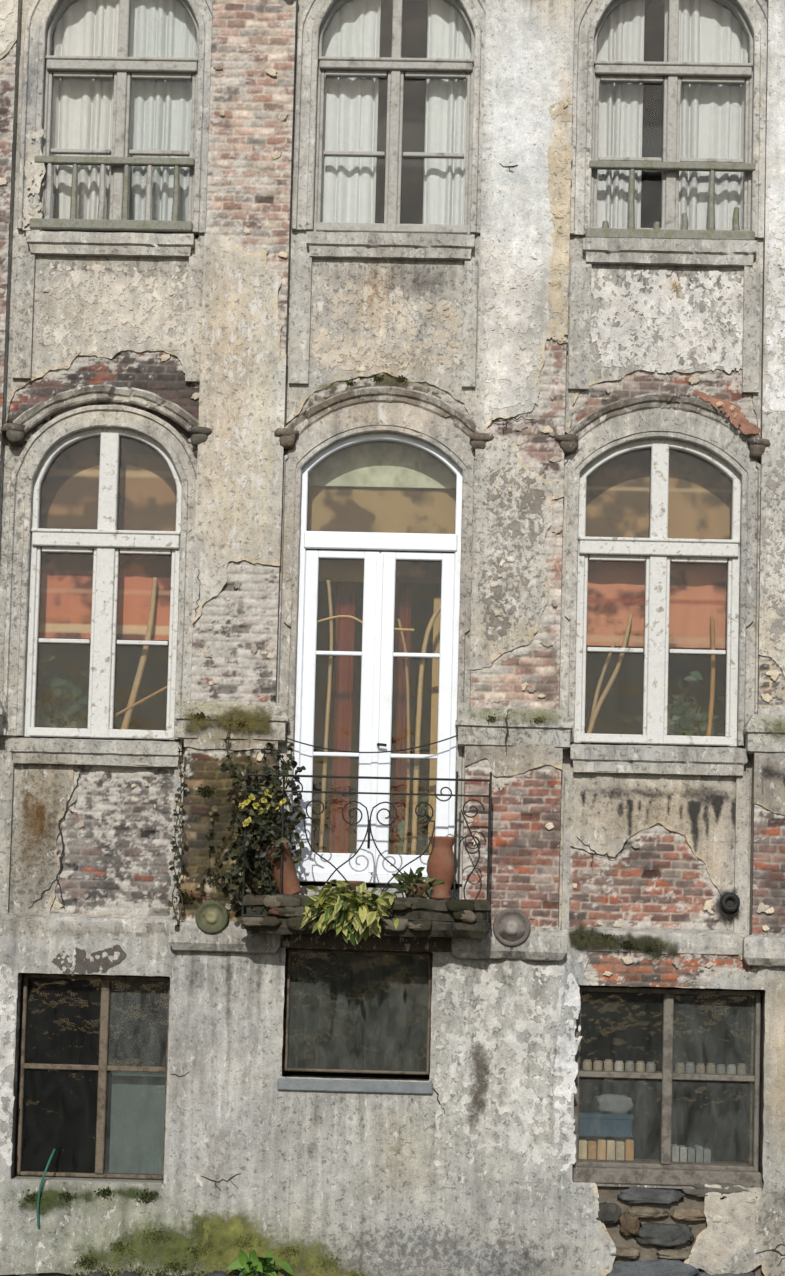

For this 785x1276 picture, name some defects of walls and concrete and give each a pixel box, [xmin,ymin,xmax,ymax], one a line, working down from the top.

flaking render [0,0,200,470]
flaking render [206,0,296,356]
flaking render [285,277,469,427]
peeling [470,97,785,709]
flaking render [191,560,280,703]
crack [29,771,82,909]
flaking render [50,747,277,922]
flaking render [462,758,728,930]
water stain [582,790,736,851]
flaking render [752,804,785,936]
peeling [0,964,18,1166]
flaking render [690,1184,761,1274]